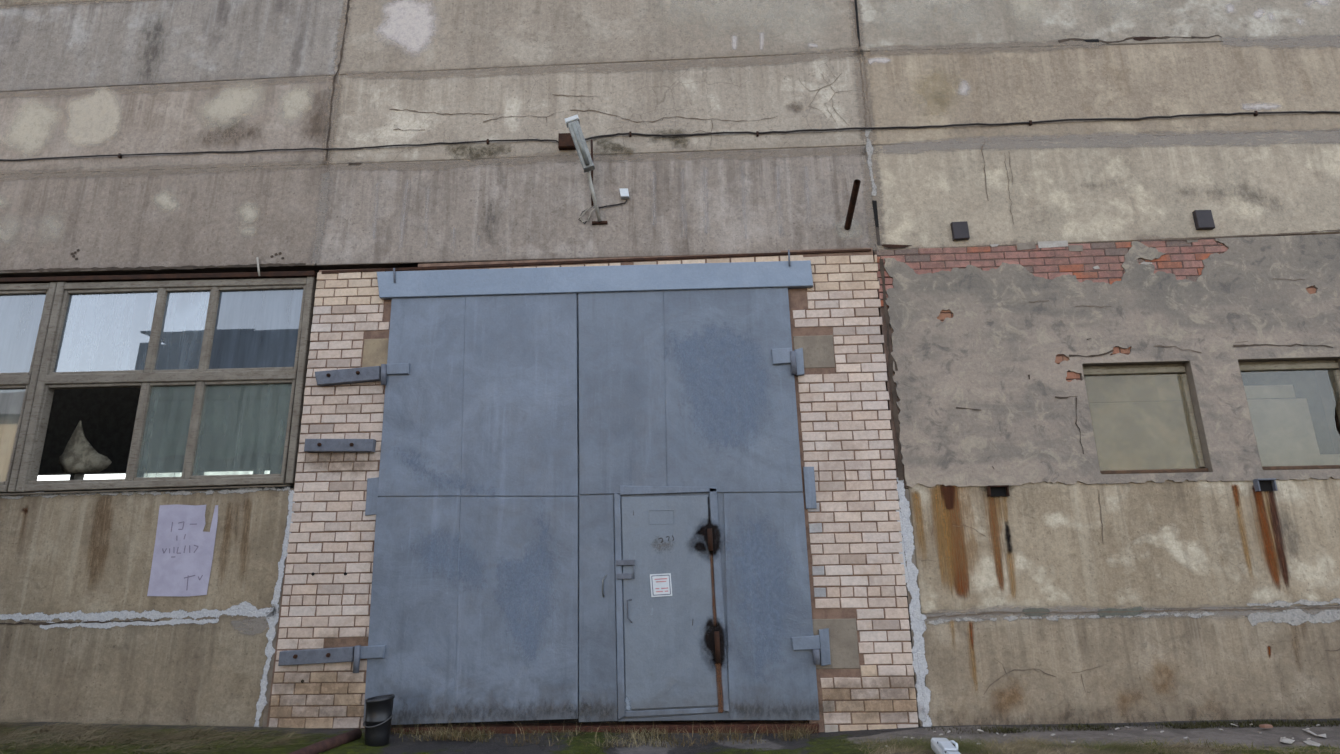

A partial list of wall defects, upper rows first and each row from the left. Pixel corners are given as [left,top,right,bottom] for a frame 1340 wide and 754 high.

crack [389,94,777,145]
crack [799,63,850,124]
flaking render [875,237,1228,308]
flaking render [1055,354,1081,382]
flaking render [1110,347,1131,355]
corrosion [913,485,969,596]
corrosion [988,496,1015,596]
corrosion [1232,485,1289,587]